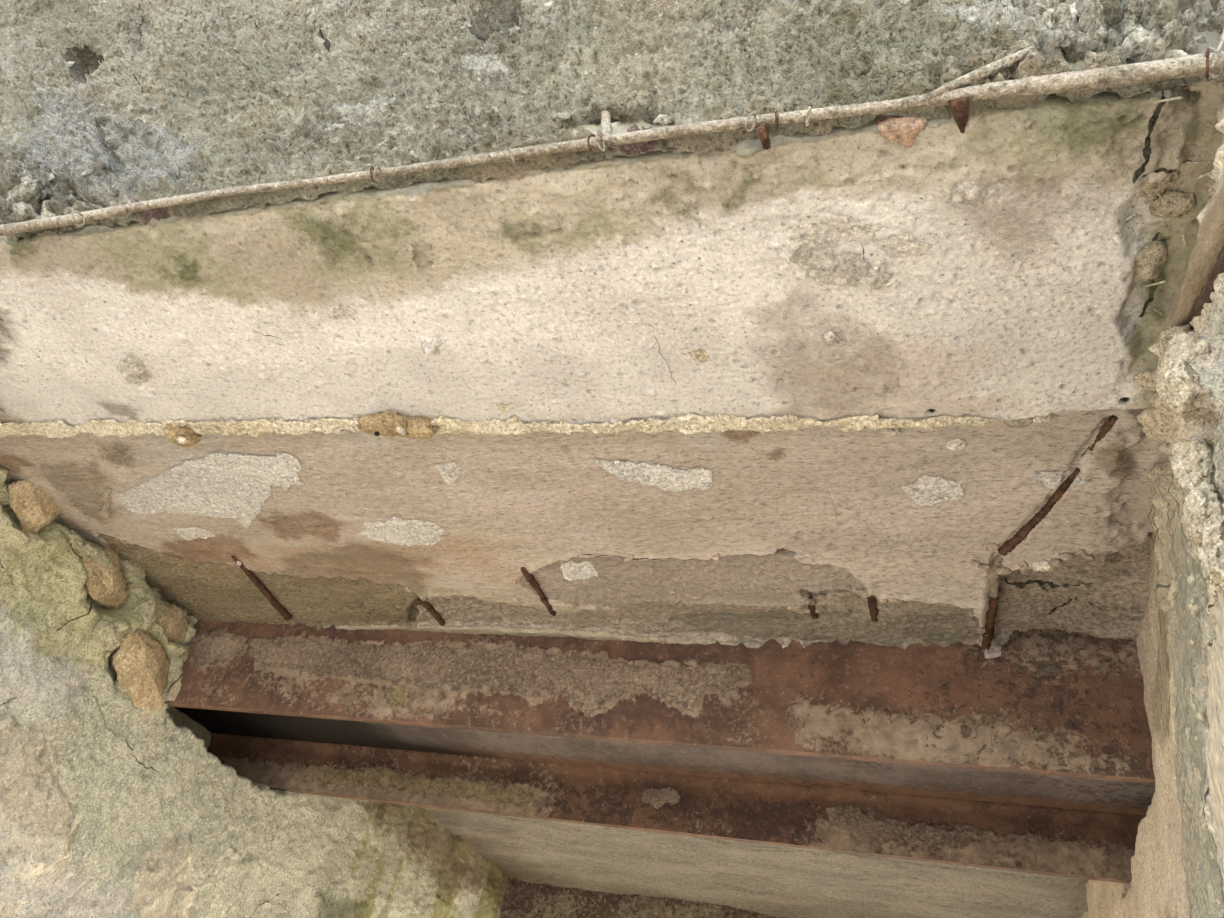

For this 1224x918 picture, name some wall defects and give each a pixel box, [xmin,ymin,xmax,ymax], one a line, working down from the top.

spalling [0,28,1224,258]
corrosion [598,124,664,156]
crack [1132,89,1191,183]
corrosion [127,193,170,223]
leakage [688,349,709,363]
leakage [0,417,361,438]
leakage [431,403,1006,435]
spalling [1089,415,1118,451]
spalling [90,452,1152,652]